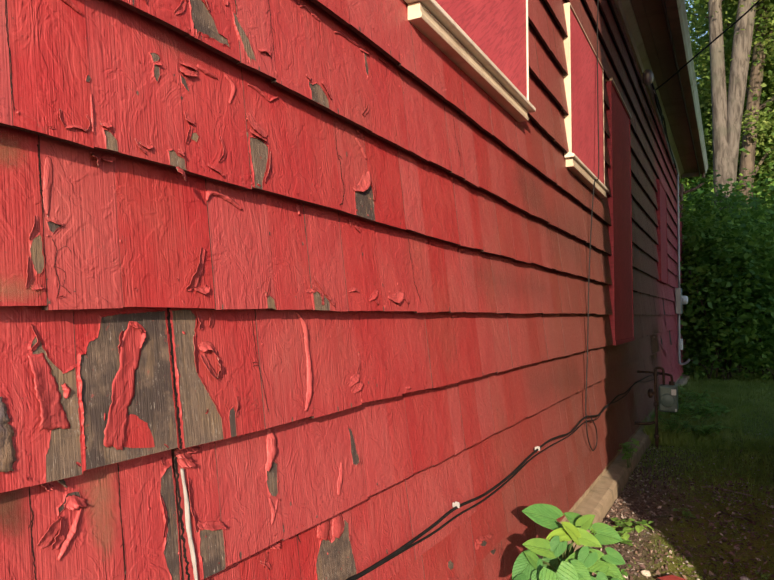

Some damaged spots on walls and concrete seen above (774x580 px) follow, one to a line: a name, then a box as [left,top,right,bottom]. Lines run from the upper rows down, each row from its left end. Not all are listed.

peeling [174,0,272,66]
peeling [306,74,332,109]
peeling [59,93,119,167]
peeling [166,111,200,181]
peeling [246,112,271,190]
peeling [26,156,64,290]
peeling [349,170,376,232]
crack [51,236,72,301]
peeling [0,396,17,473]
peeling [27,309,240,580]
peeling [265,427,279,525]
peeling [315,509,357,580]